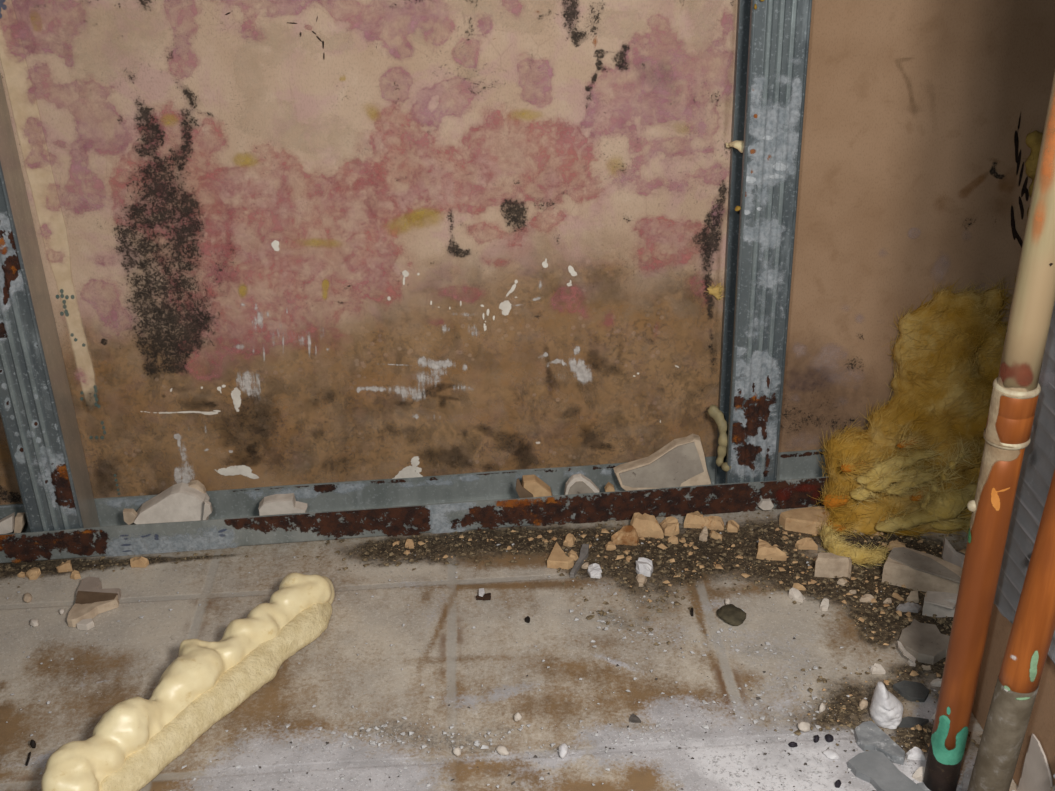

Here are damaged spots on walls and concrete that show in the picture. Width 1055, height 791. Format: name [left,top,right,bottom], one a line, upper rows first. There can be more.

corrosion [0,213,24,341]
water stain [47,0,733,498]
corrosion [743,76,802,309]
water stain [0,432,21,505]
corrosion [0,318,829,563]